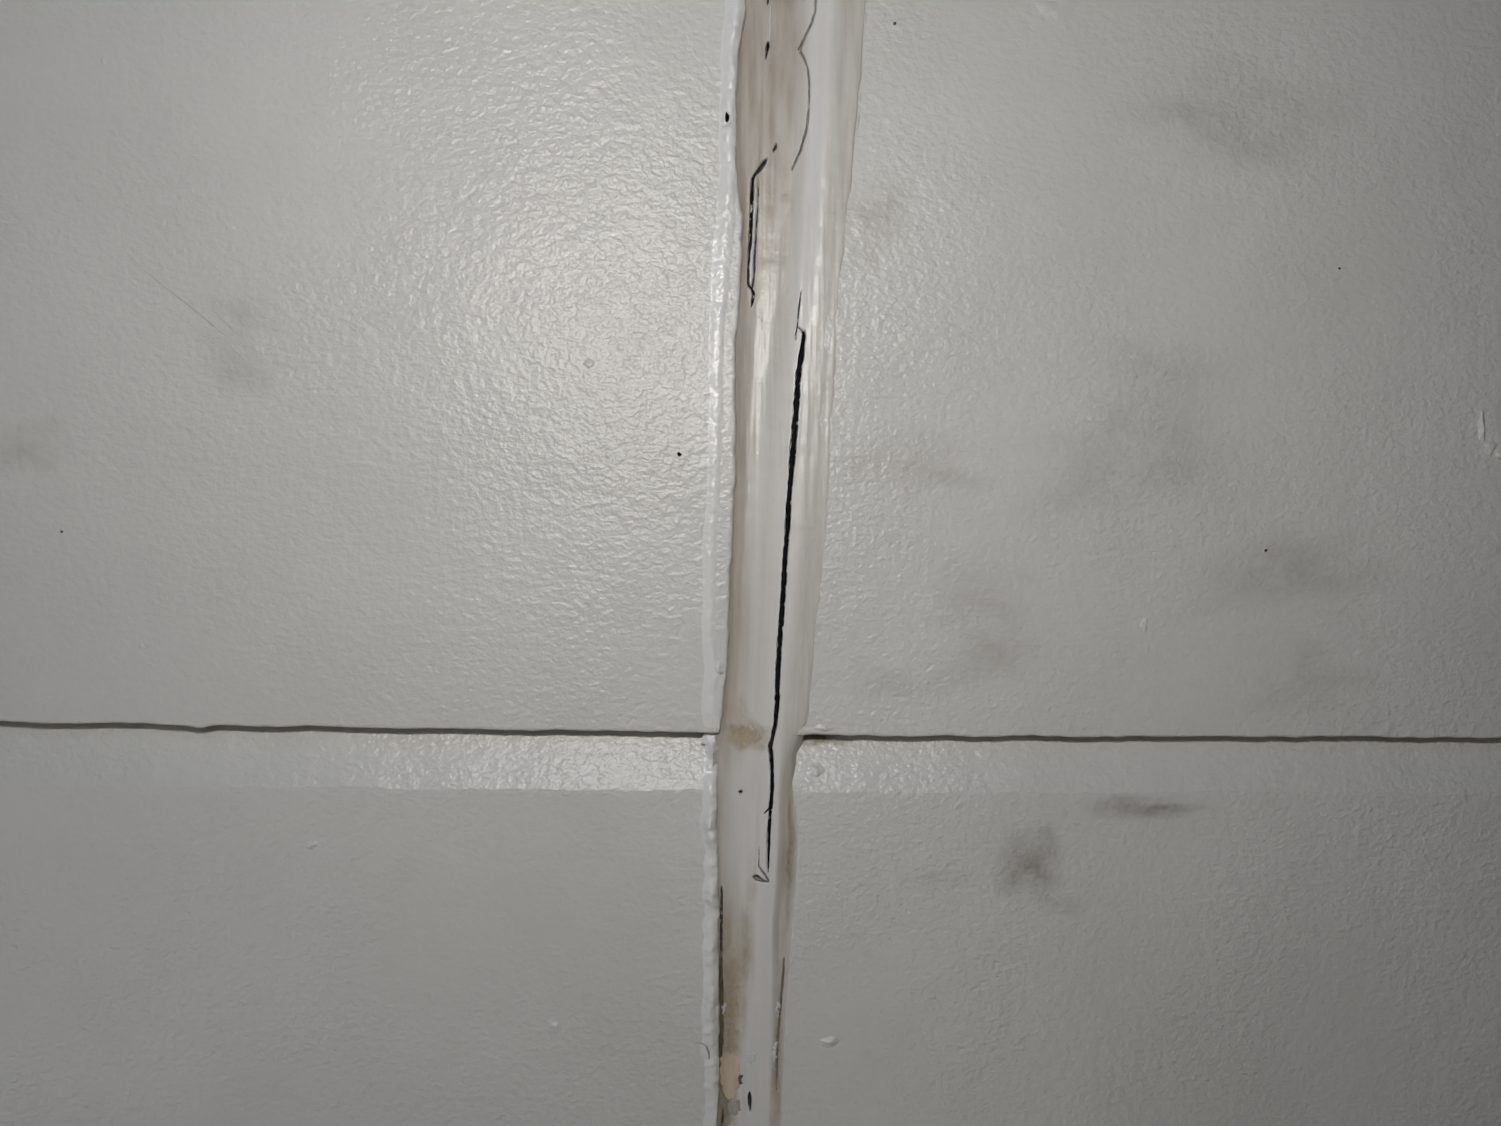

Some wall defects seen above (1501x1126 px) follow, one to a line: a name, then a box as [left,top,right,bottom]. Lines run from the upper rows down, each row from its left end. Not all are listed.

crack [747,0,816,307]
crack [764,294,805,873]
peeling [719,1042,778,1126]